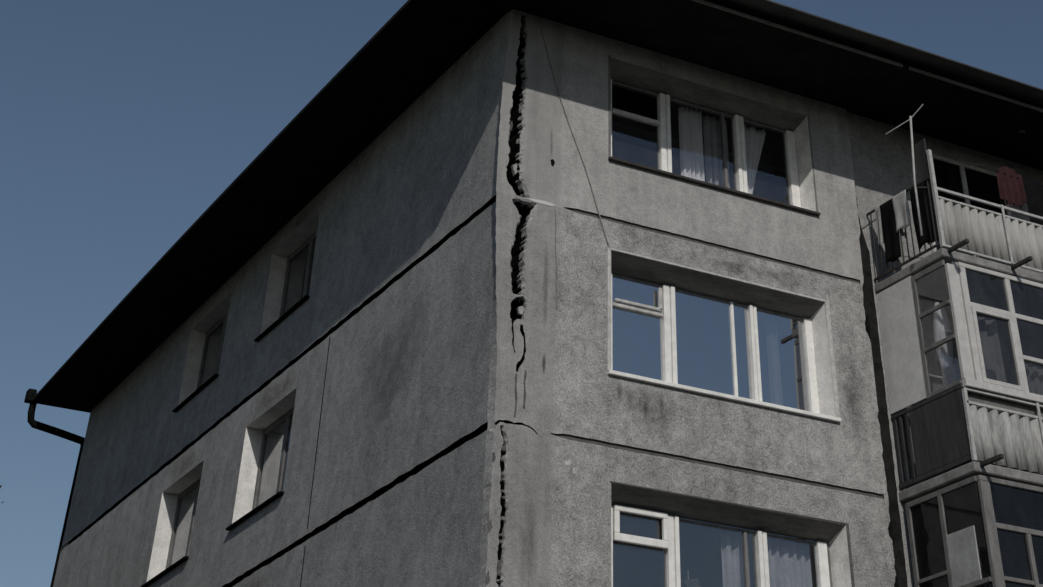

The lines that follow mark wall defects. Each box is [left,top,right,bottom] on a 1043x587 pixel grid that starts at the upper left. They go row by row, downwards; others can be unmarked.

crack [494,12,557,587]